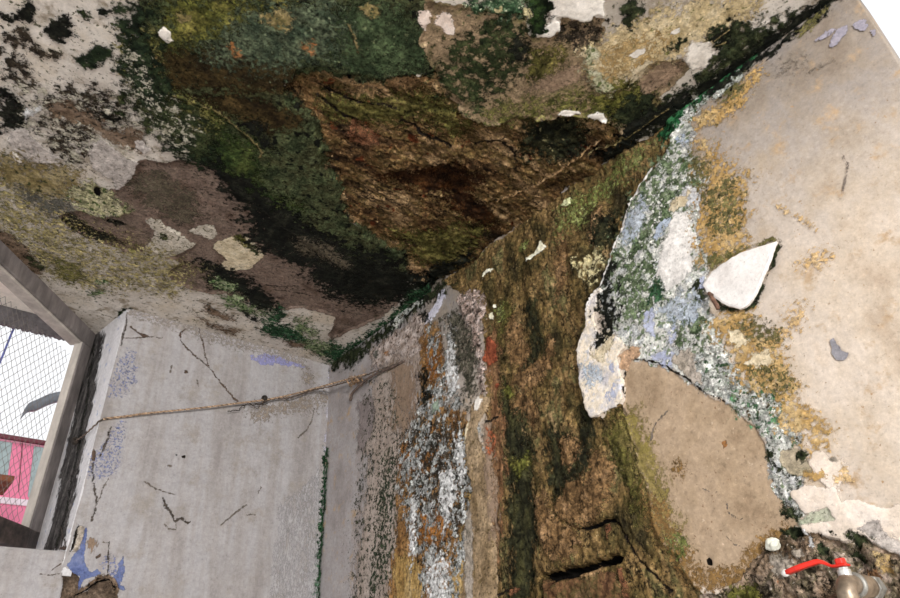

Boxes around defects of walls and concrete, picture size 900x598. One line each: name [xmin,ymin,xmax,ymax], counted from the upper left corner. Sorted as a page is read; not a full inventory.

water stain [0,0,488,598]
spalling [285,0,900,598]
crack [121,315,239,402]
crack [144,481,191,530]
crack [221,487,262,526]
flaking render [60,573,119,598]